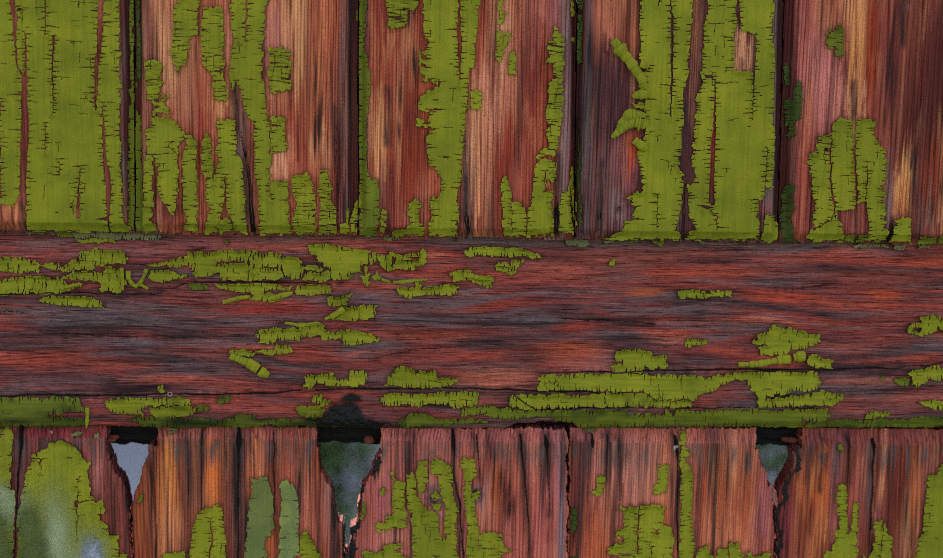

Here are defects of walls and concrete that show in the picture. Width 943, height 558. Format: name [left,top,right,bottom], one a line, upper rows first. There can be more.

peeling [603,0,943,250]
peeling [0,0,591,378]
peeling [678,289,732,299]
peeling [907,315,943,337]
peeling [0,395,128,558]
peeling [162,503,227,558]
peeling [104,370,368,435]
peeling [244,476,321,558]
peeling [362,325,943,558]